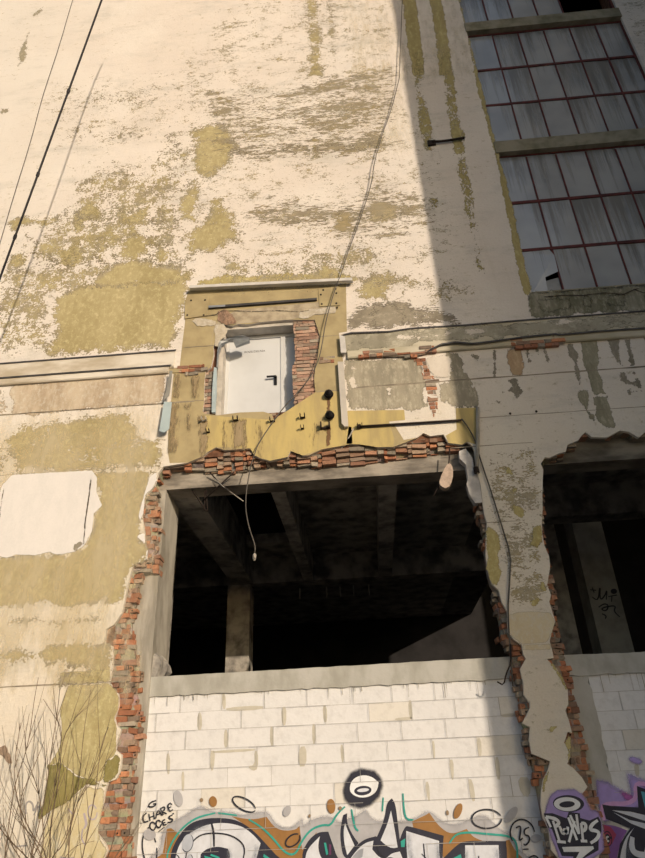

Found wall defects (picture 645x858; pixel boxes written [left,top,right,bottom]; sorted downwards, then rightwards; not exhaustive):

peeling [18,35,28,64]
leakage [401,0,433,151]
peeling [42,78,167,148]
leakage [429,0,478,233]
peeling [468,38,532,295]
leakage [344,285,645,428]
spalling [510,318,580,362]
peeling [9,374,167,417]
peeling [495,378,523,404]
spalling [541,432,645,468]
spalling [151,653,172,677]
flaking render [0,745,12,764]